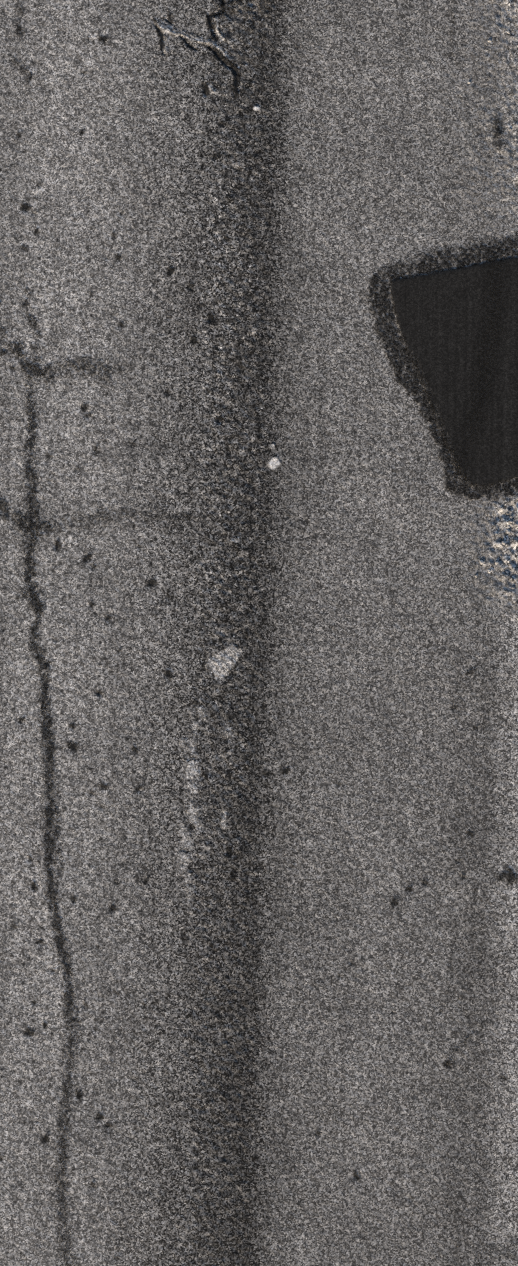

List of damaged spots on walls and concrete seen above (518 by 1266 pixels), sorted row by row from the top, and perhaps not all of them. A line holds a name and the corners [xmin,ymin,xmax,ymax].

crack [153,0,240,98]
crack [0,289,160,1241]